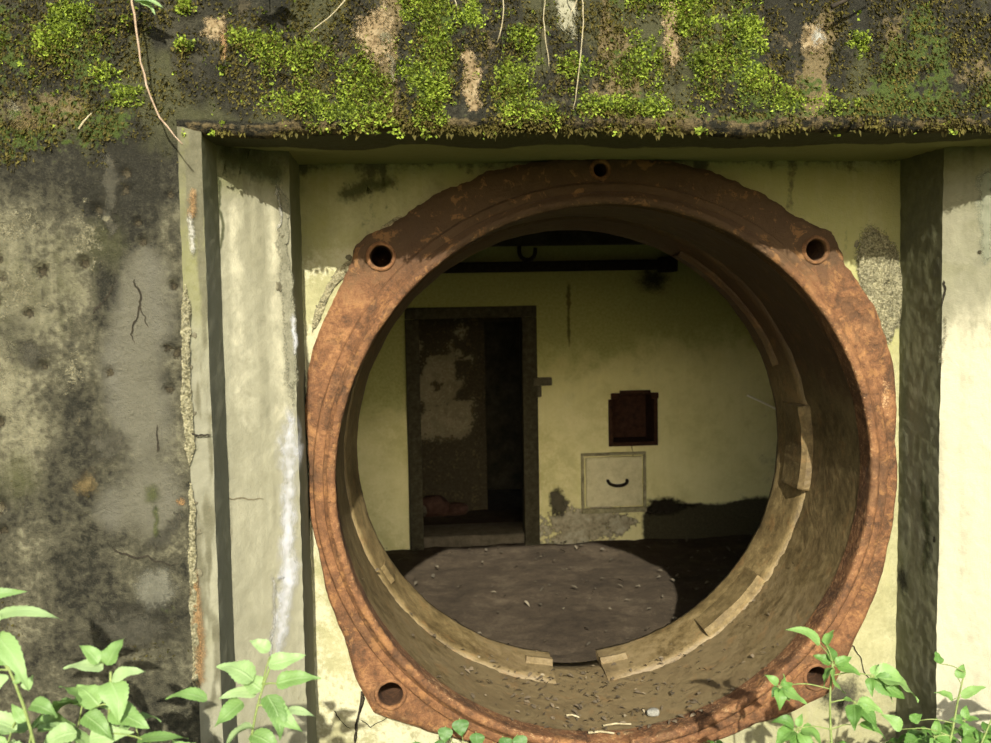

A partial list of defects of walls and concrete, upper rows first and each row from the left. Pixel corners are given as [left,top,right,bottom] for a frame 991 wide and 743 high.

damp [99,154,120,237]
crack [93,279,149,344]
spalling [854,224,903,344]
damp [147,488,186,547]
damp [269,417,297,656]
peeling [540,488,640,544]
spalling [188,483,203,688]
damp [81,606,173,650]